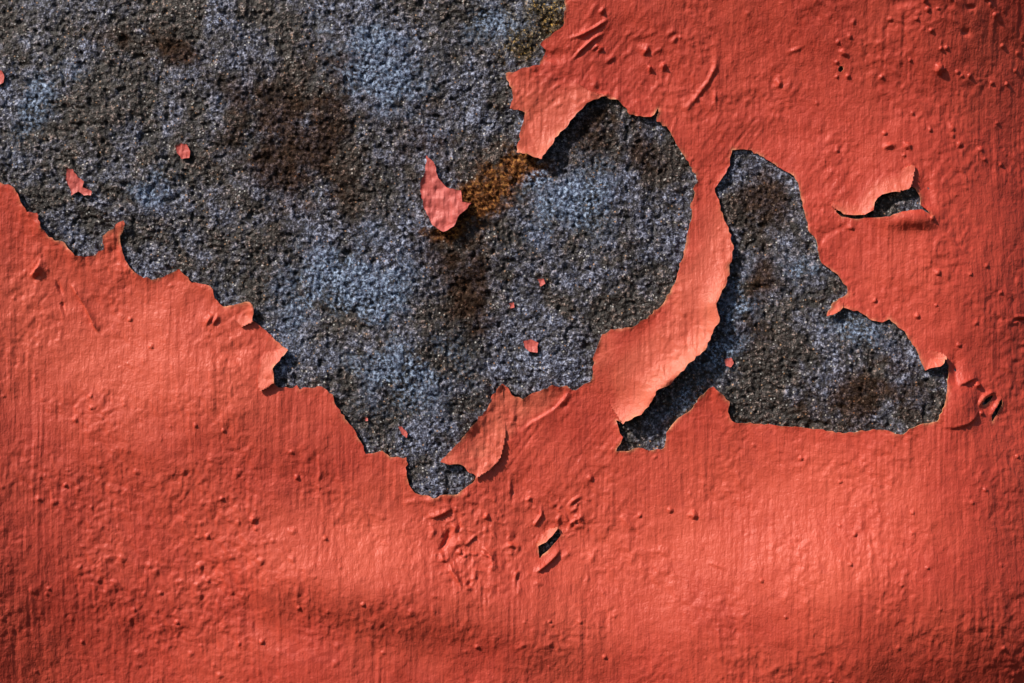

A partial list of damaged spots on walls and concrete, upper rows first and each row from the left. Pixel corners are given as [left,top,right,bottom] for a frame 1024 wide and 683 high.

rust [437,154,540,236]
peeling [0,0,956,498]
peeling [538,529,560,558]